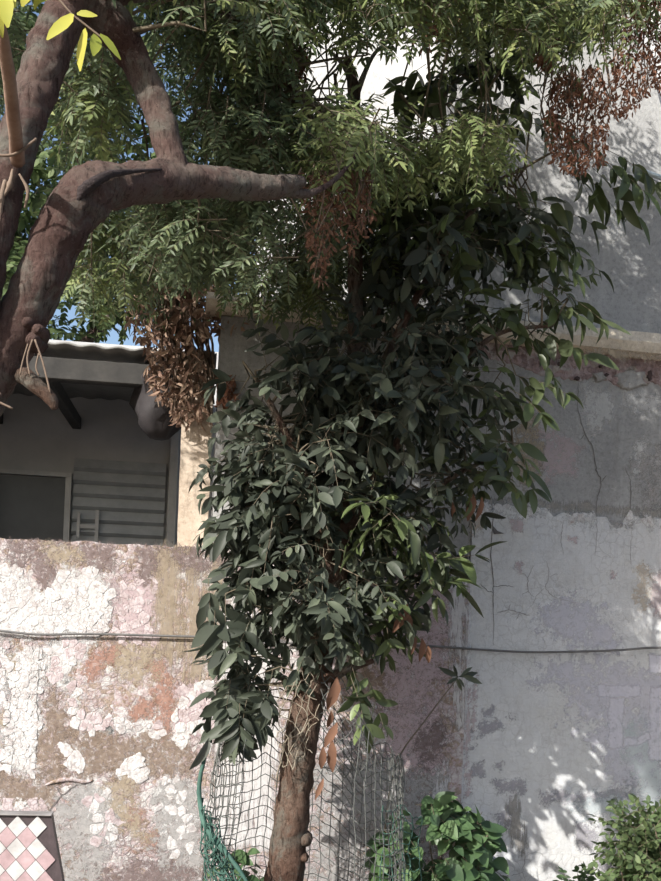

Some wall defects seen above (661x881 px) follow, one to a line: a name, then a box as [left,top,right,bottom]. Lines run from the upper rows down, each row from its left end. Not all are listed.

spalling [469,340,661,391]
crack [577,382,632,554]
peeling [0,541,230,779]
peeling [243,627,282,701]
peeling [0,797,48,811]
peeling [71,752,200,864]
peeling [209,722,286,857]